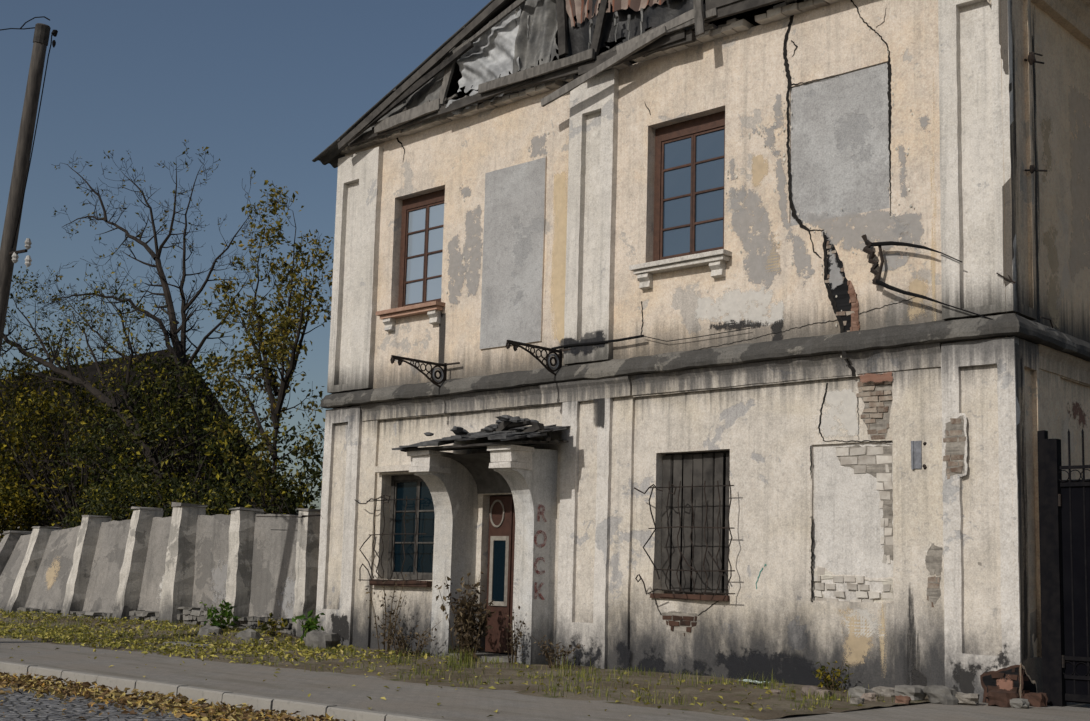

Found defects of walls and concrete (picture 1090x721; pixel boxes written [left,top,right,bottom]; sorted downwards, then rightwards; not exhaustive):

flaking render [446,184,483,307]
crack [698,0,915,478]
flaking render [695,94,926,332]
spalling [820,374,893,564]
spalling [943,413,968,479]
crack [808,515,816,602]
spalling [811,566,894,603]
spalling [924,543,944,607]
damp [565,638,601,667]
damp [616,642,841,686]
damp [907,589,927,686]